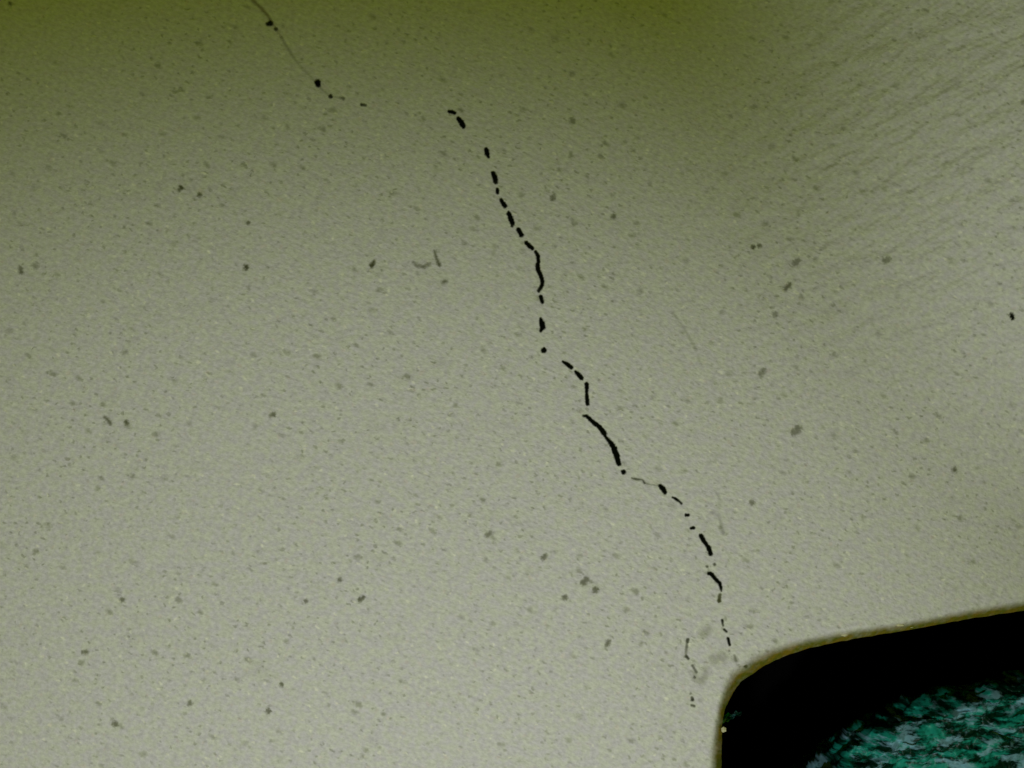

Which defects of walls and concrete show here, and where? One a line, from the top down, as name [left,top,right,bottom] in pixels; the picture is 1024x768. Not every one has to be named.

crack [448,110,466,129]
crack [484,147,731,646]